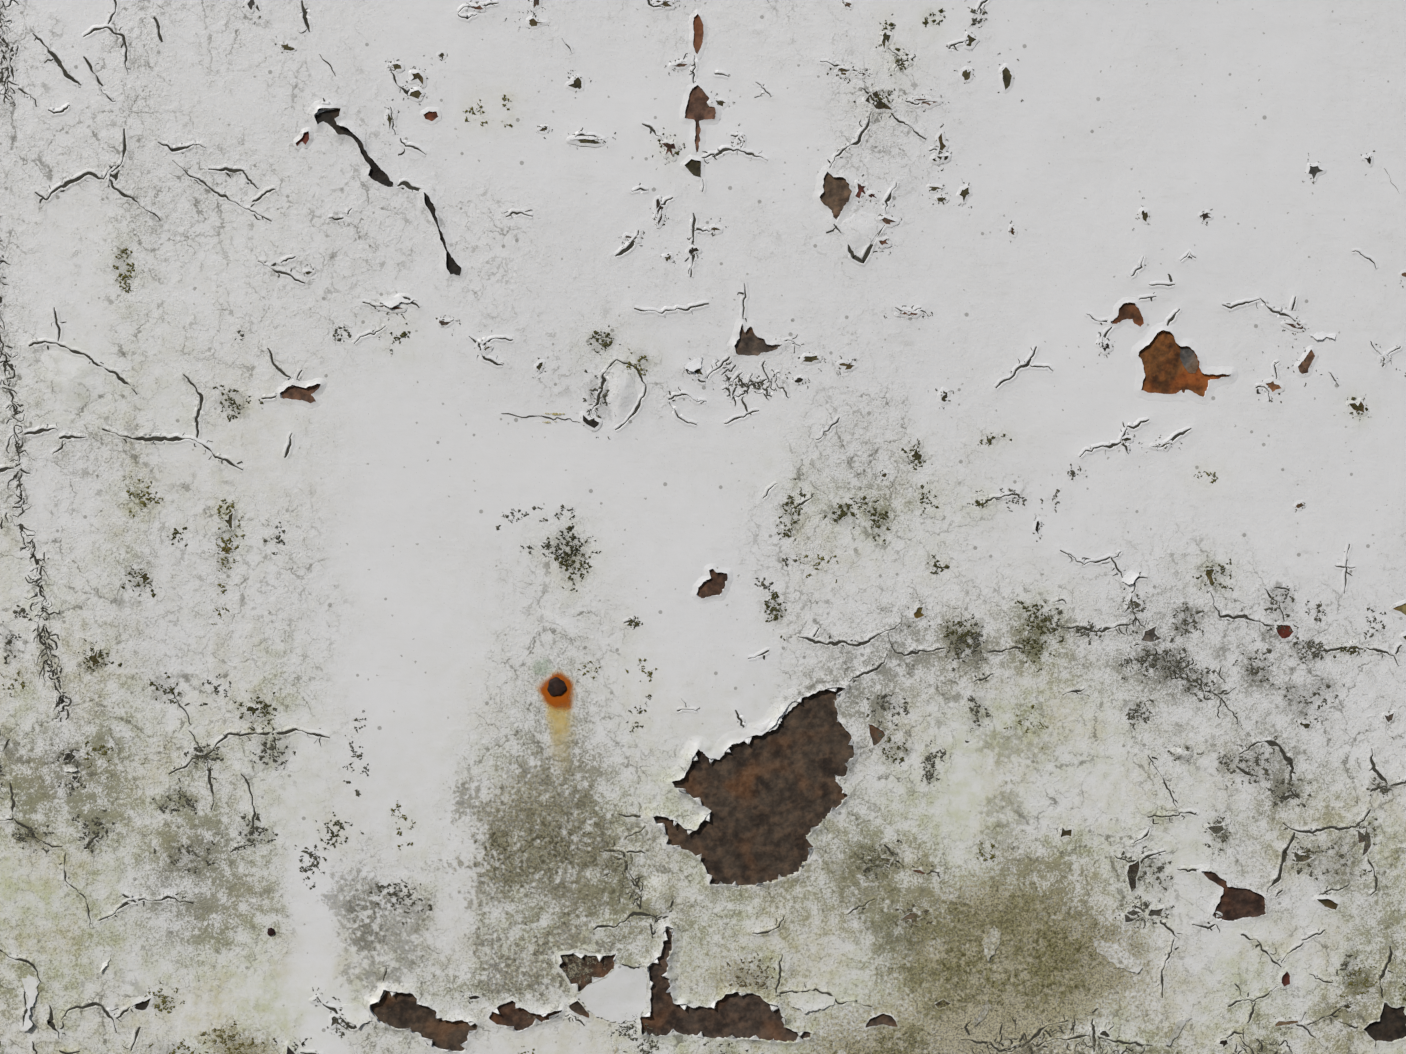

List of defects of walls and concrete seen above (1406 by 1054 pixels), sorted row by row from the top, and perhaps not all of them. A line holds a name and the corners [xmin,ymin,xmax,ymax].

peeling [650,0,735,182]
crack [0,0,276,722]
damp [496,504,601,592]
damp [200,674,296,769]
damp [295,812,364,890]
rust [539,673,573,727]
peeling [639,674,891,899]
crack [960,544,1406,1054]
peeling [1196,811,1273,928]
damp [1117,586,1386,721]
crack [0,945,143,1054]
peeling [309,916,835,1054]